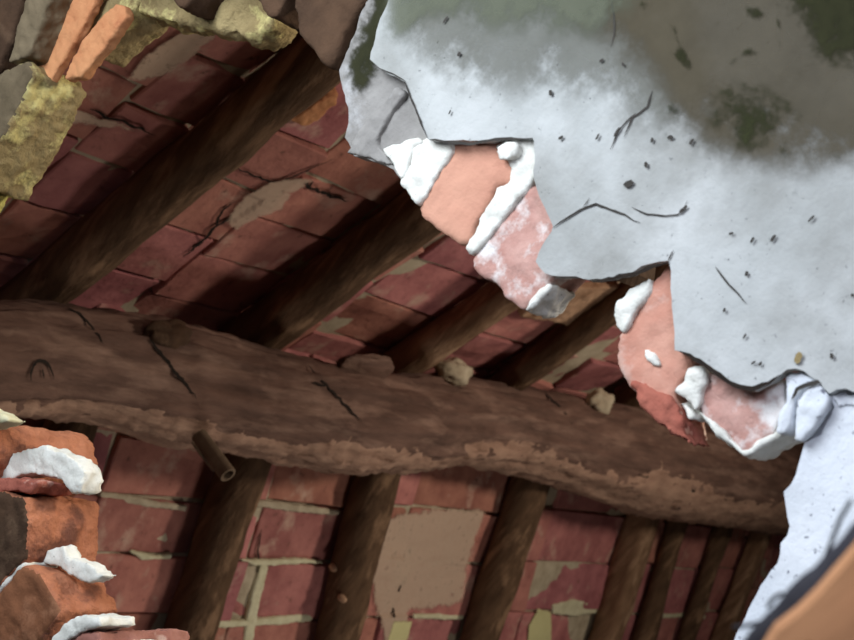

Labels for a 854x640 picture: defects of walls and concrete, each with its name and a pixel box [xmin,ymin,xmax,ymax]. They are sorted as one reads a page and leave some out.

damp [391,0,685,118]
spalling [339,0,427,179]
crack [611,92,652,147]
peeling [497,141,523,160]
crack [183,201,236,257]
crack [554,199,687,227]
spalling [518,281,619,326]
crack [150,339,196,397]
crack [308,365,361,421]
peeling [645,350,662,367]